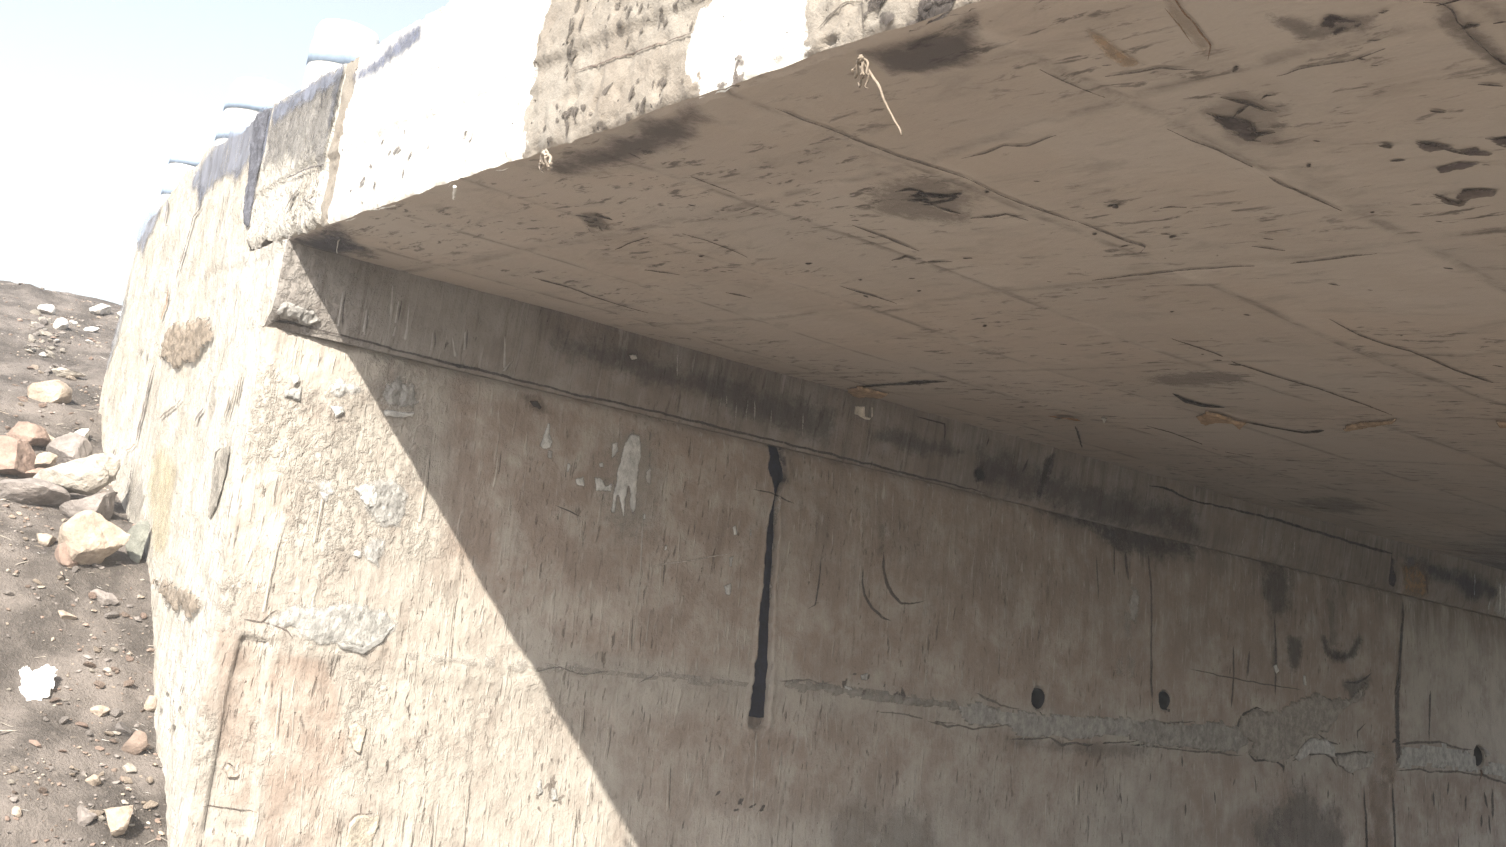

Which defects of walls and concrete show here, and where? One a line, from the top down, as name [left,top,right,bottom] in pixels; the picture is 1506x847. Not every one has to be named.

water stain [872,33,969,72]
crack [1423,0,1506,87]
water stain [552,122,688,173]
crack [778,109,1371,280]
crack [1418,138,1505,203]
spalling [138,317,213,369]
crack [749,446,832,718]
crack [1237,556,1431,847]